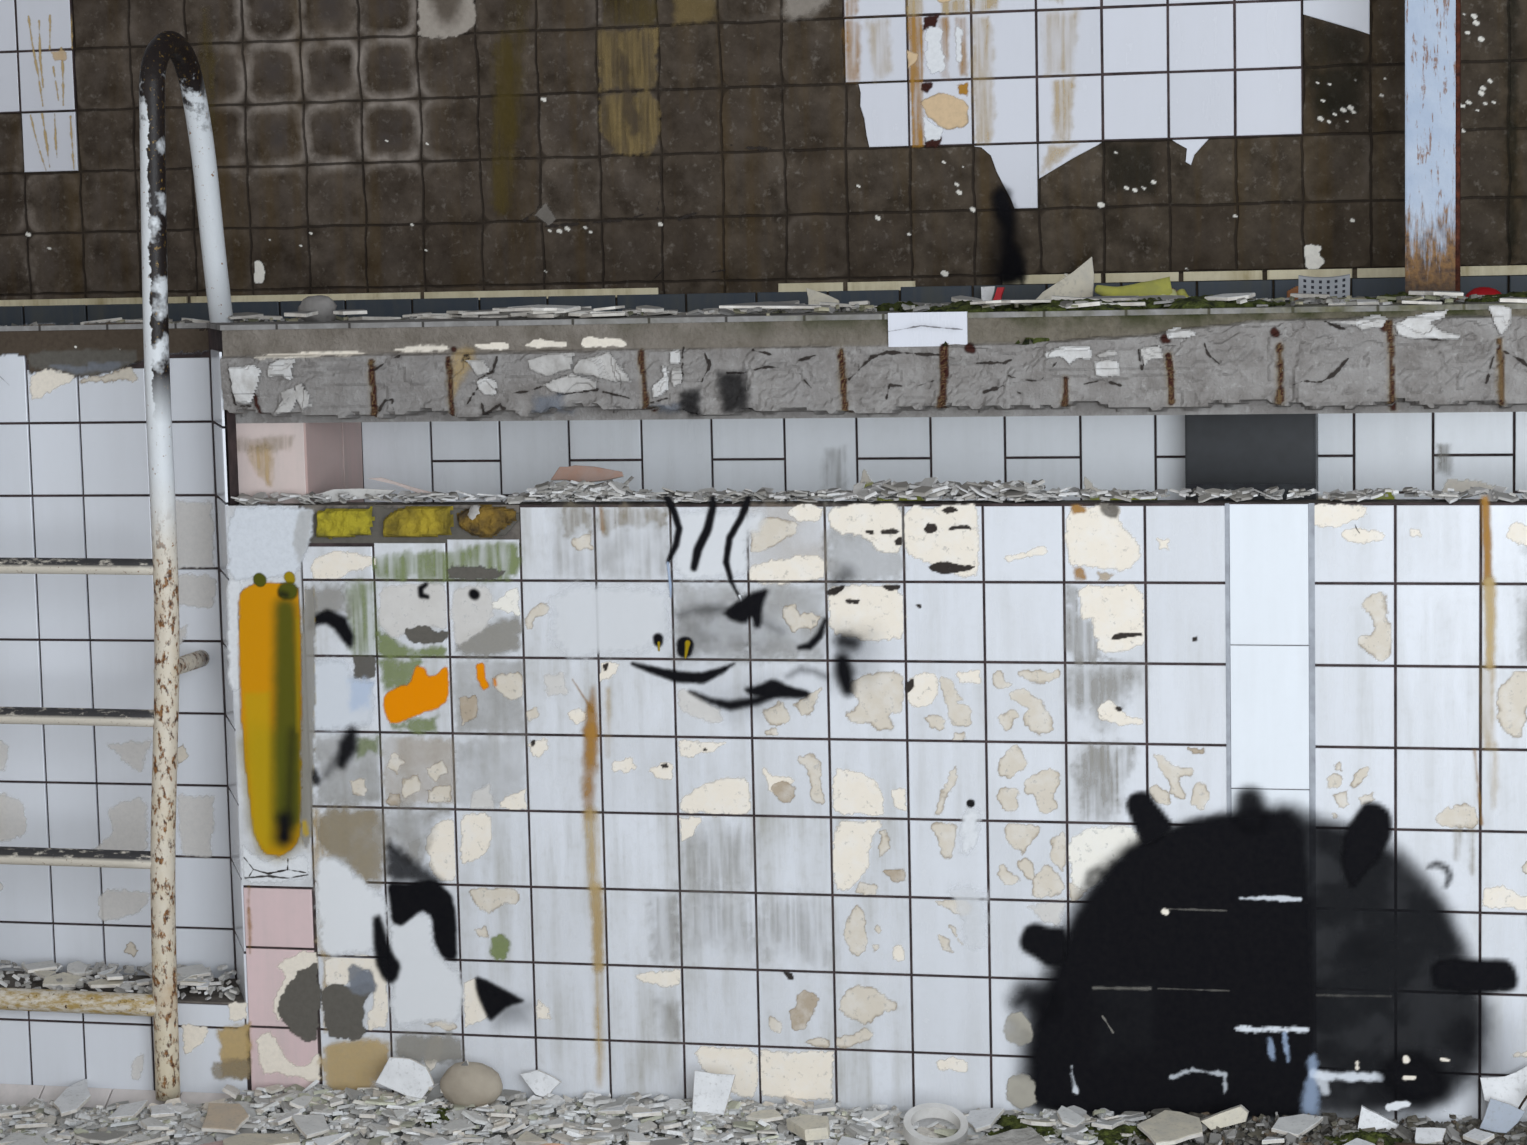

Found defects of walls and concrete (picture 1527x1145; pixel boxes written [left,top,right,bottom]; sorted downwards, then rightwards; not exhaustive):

corrosion [28,15,74,167]
spalling [0,320,144,378]
flaking render [465,336,631,396]
corrosion [937,344,949,409]
corrosion [1165,353,1175,405]
corrosion [1387,320,1396,410]
flaking render [1330,309,1460,340]
peeling [929,562,975,574]
corrosion [1482,496,1495,668]
peeling [905,669,1140,901]
corrosion [583,697,602,970]
peeling [680,753,907,961]